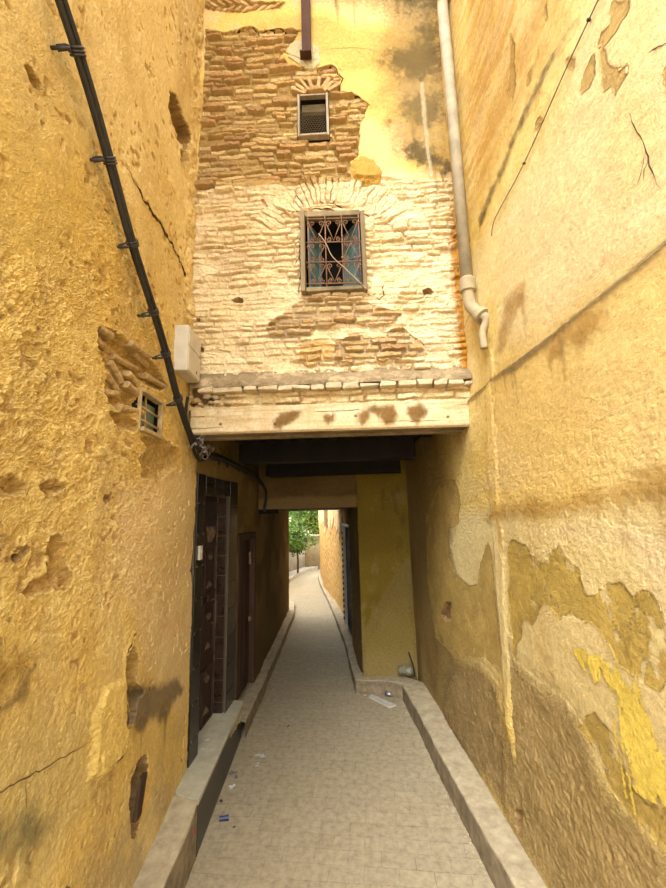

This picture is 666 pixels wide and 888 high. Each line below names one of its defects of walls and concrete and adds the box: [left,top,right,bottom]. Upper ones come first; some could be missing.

crack [127,168,186,276]
flaking render [168,25,368,192]
damp [378,0,451,175]
peeling [565,0,630,97]
crack [629,113,661,189]
damp [467,240,666,404]
flaking render [97,325,180,483]
crack [0,742,90,807]
damp [127,681,182,730]
flaking render [426,480,666,888]